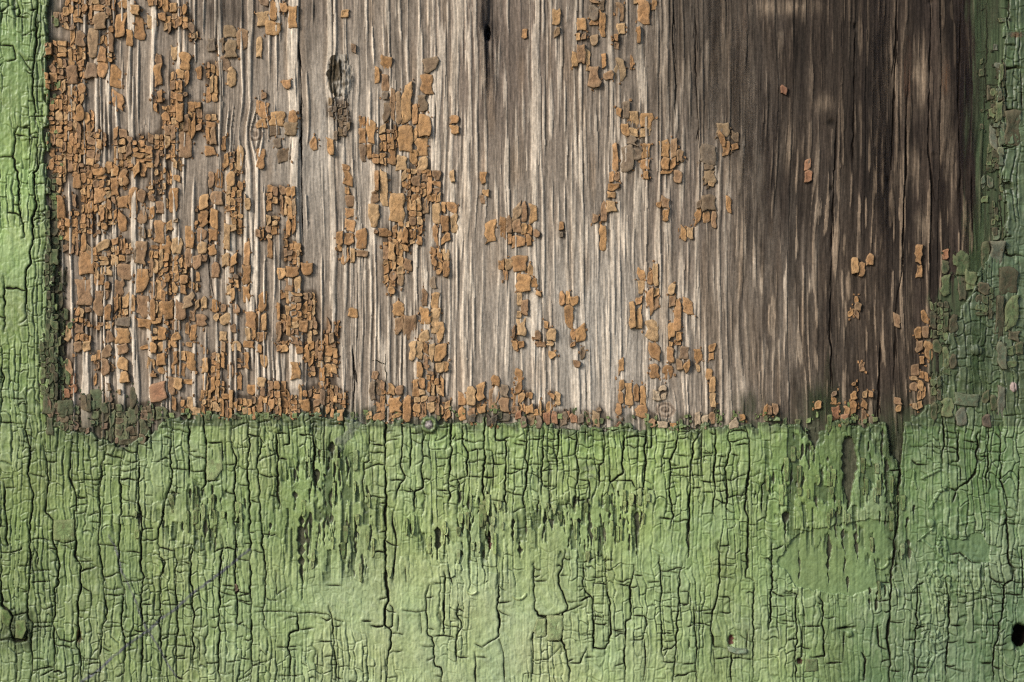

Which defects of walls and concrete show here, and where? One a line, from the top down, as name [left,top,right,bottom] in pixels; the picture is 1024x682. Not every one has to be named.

crack [0,0,50,329]
crack [207,177,215,296]
crack [297,21,305,241]
peeling [38,0,915,610]
crack [672,0,700,147]
crack [827,33,856,390]
crack [875,2,935,423]
peeling [893,44,1024,427]
crack [956,0,1024,257]
crack [0,349,1024,682]